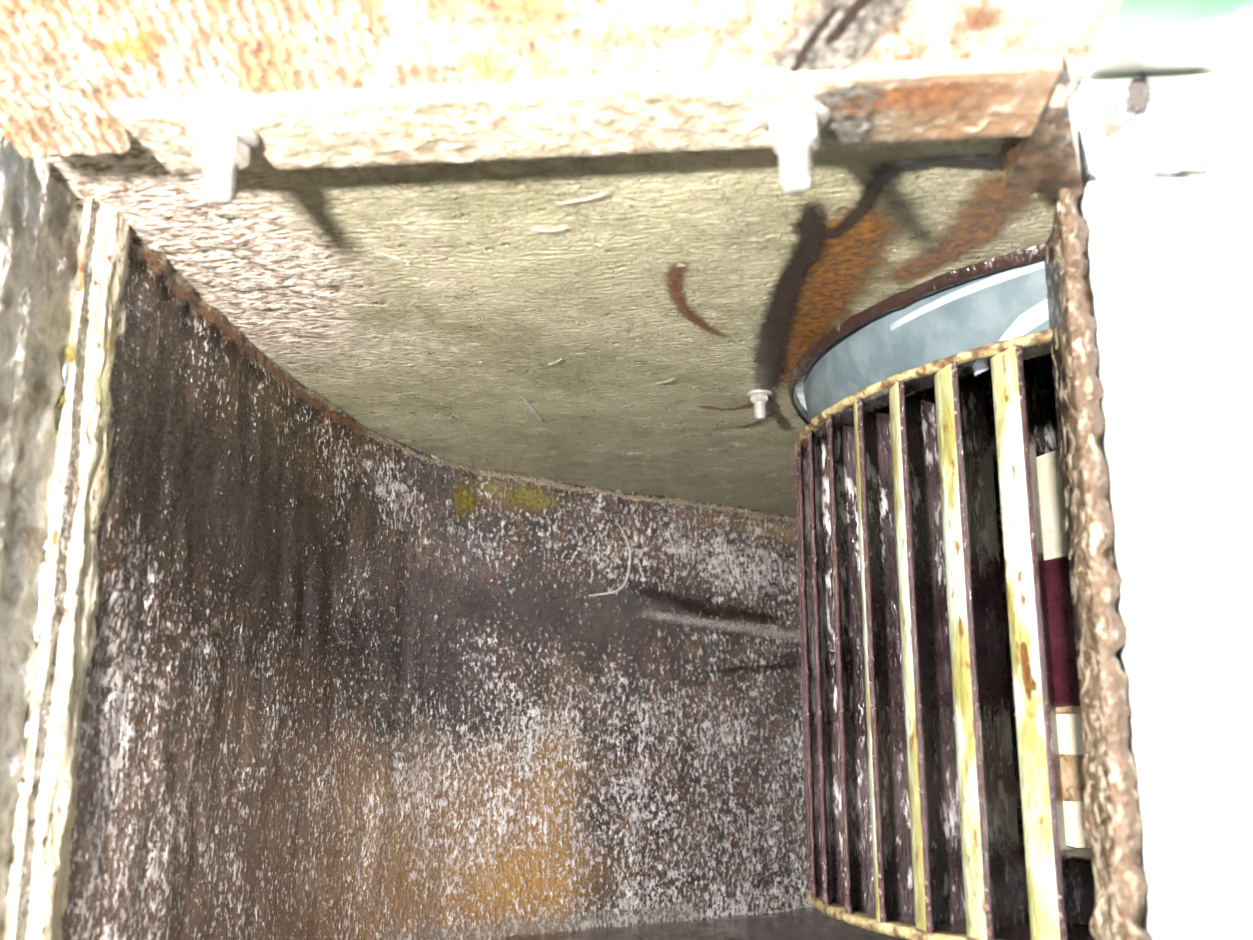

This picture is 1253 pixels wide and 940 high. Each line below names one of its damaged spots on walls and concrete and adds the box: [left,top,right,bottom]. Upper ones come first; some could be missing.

corrosion [965,4,995,30]
corrosion [112,39,144,58]
damp [790,0,871,72]
corrosion [847,82,977,114]
damp [638,588,781,621]
damp [710,663,801,673]